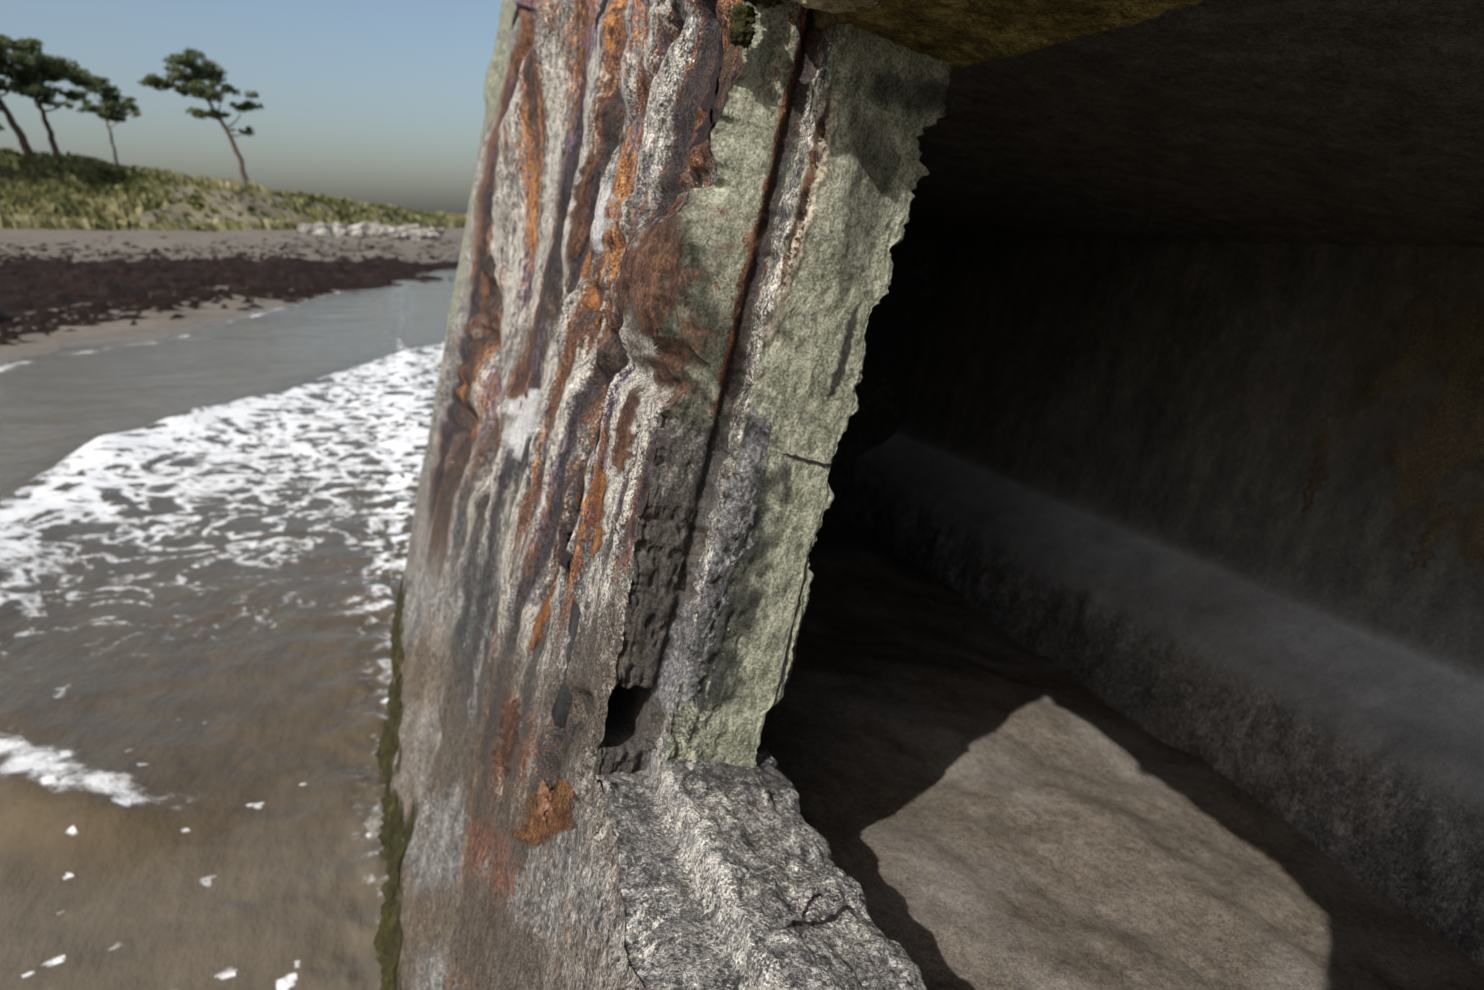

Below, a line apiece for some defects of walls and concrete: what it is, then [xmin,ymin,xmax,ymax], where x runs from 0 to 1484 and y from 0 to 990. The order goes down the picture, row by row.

rust [567,152,602,329]
rust [573,386,640,559]
rust [527,566,560,653]
rust [493,698,520,775]